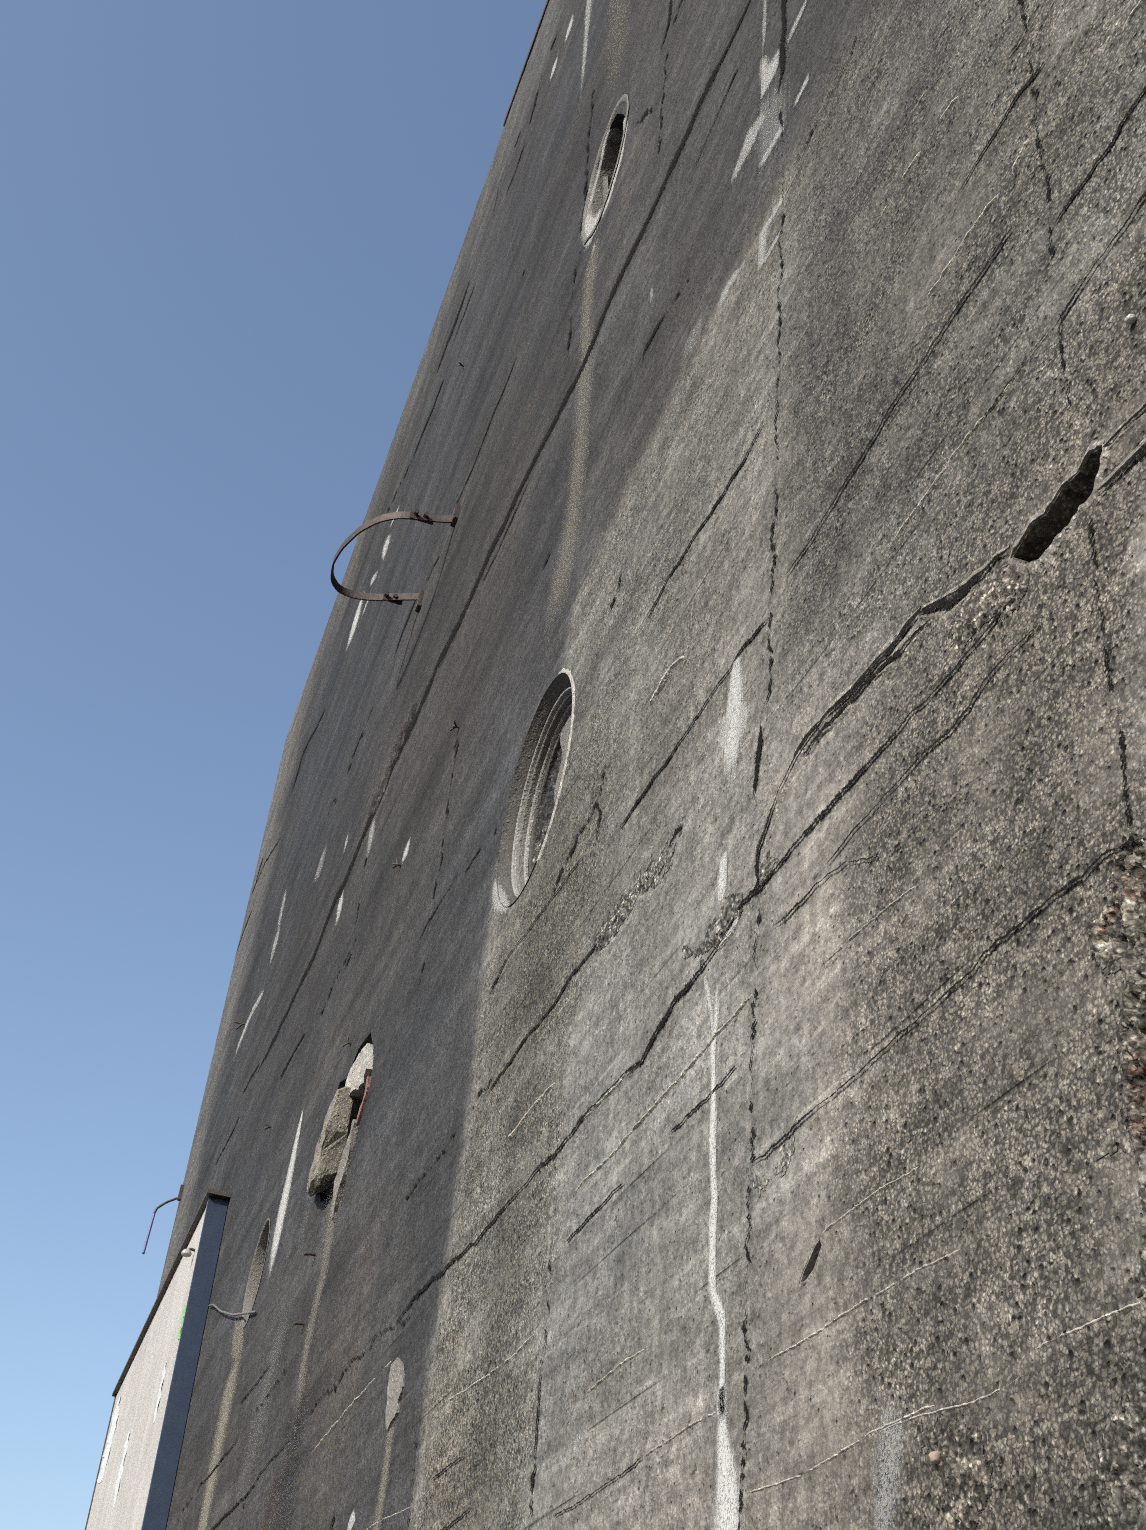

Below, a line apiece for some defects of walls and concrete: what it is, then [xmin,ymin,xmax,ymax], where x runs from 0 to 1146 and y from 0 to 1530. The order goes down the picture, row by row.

crack [216,0,750,1163]
crack [310,0,1146,1530]
crack [177,1361,292,1530]
spalling [331,1043,374,1222]
leakage [704,978,741,1530]
spalling [1081,1363,1146,1530]
spalling [1087,834,1146,1300]